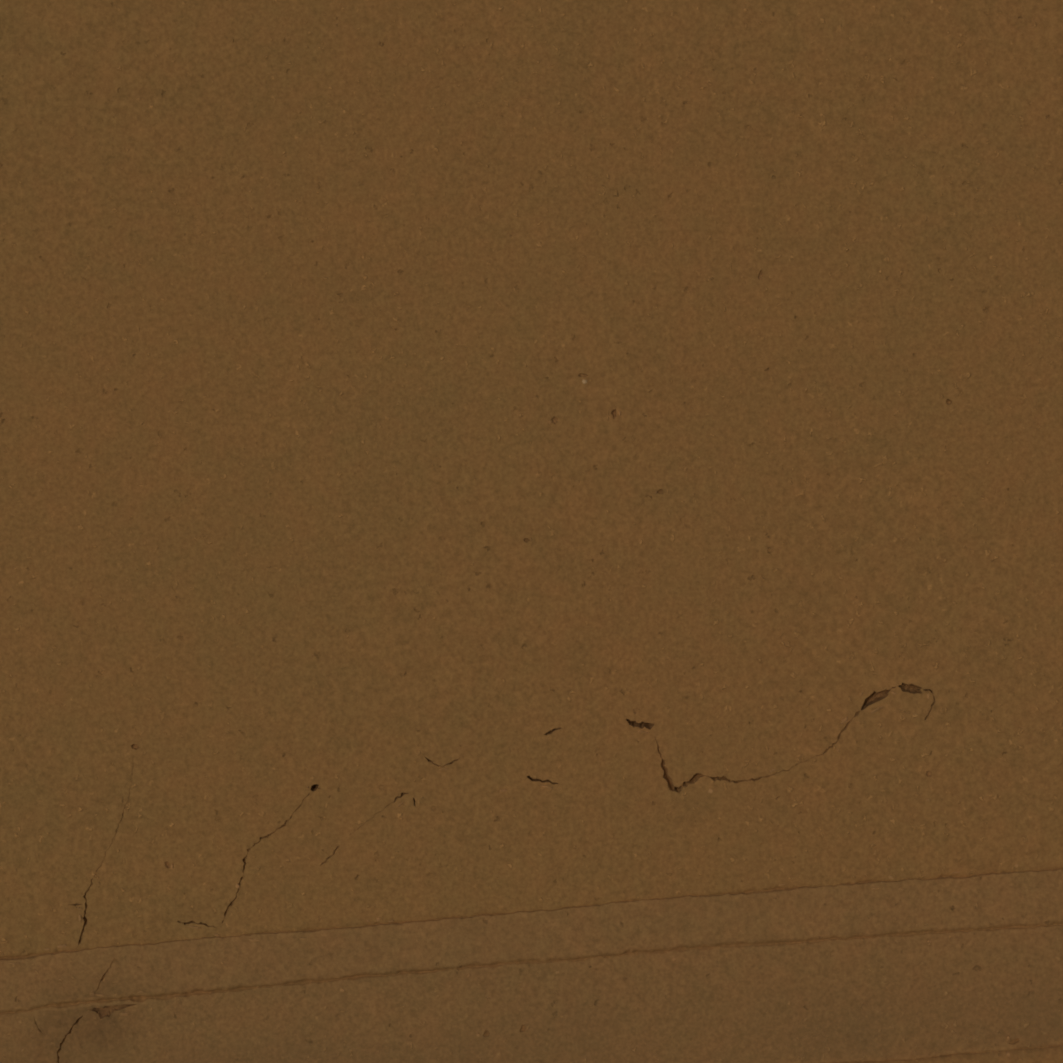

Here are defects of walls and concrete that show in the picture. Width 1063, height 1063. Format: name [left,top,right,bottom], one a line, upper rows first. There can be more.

crack [626,683,935,794]
crack [0,768,1063,1063]